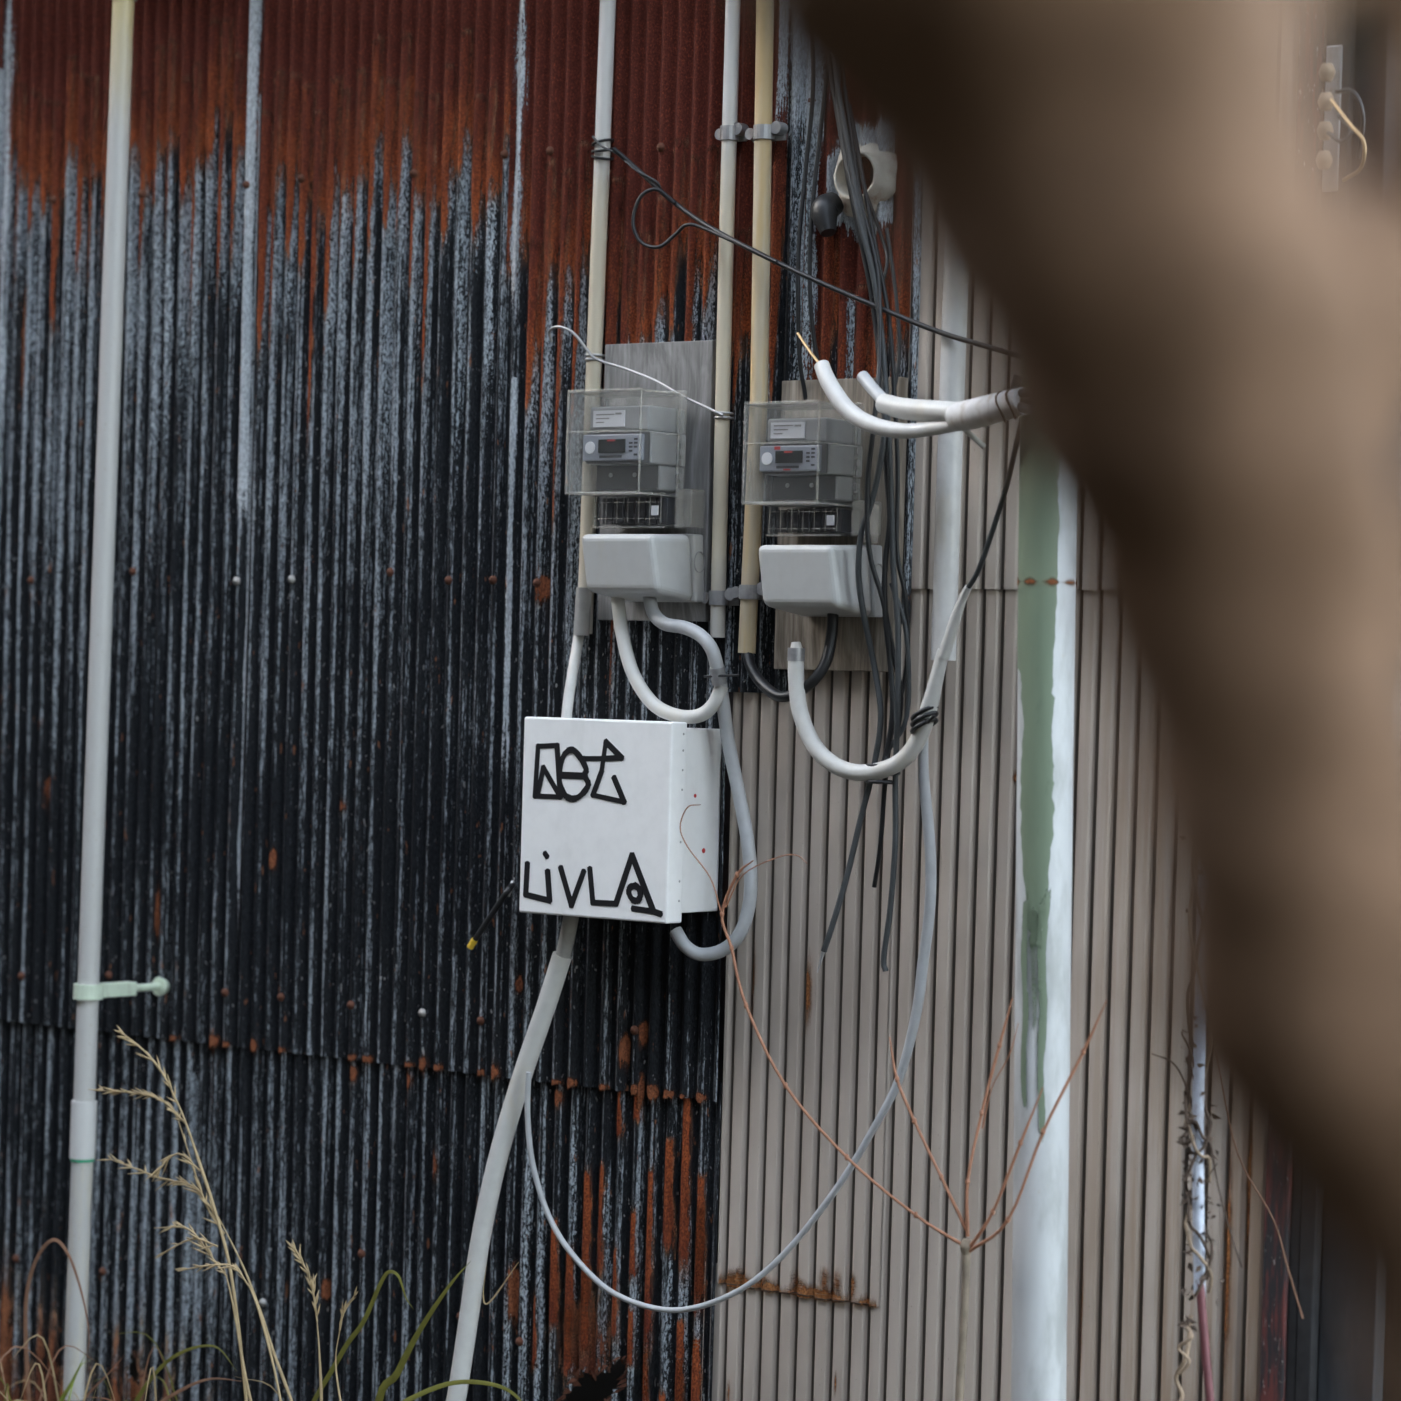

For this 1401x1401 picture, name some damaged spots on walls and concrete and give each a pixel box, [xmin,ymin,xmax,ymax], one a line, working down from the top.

peeling [0,0,87,495]
rust [0,0,112,336]
peeling [127,0,529,909]
rust [127,0,756,525]
peeling [501,257,605,779]
peeling [628,299,666,344]
peeling [692,241,717,341]
rust [769,51,789,407]
rust [800,100,911,380]
rust [0,1249,66,1401]
rust [86,1315,184,1401]
rust [506,1020,876,1401]